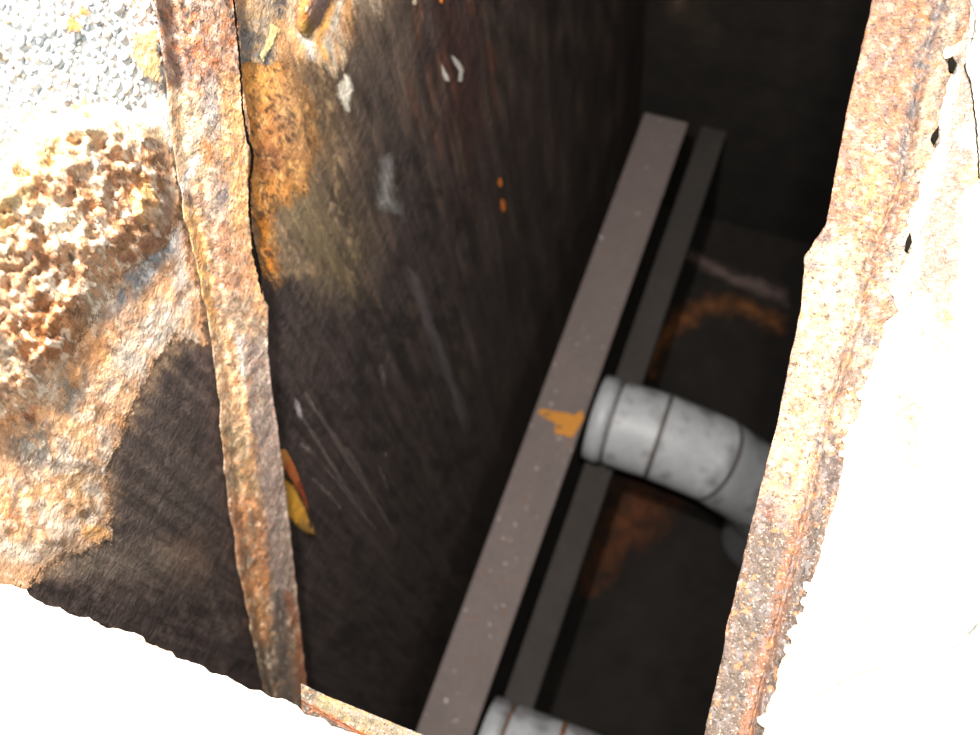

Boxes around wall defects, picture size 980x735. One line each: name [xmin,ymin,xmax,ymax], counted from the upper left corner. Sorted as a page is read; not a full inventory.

rust [129,30,162,82]
crack [233,0,263,294]
rust [241,0,385,283]
crack [963,0,980,183]
rust [0,217,208,589]
rust [280,449,315,535]
rust [538,409,584,438]
spalling [757,32,979,735]